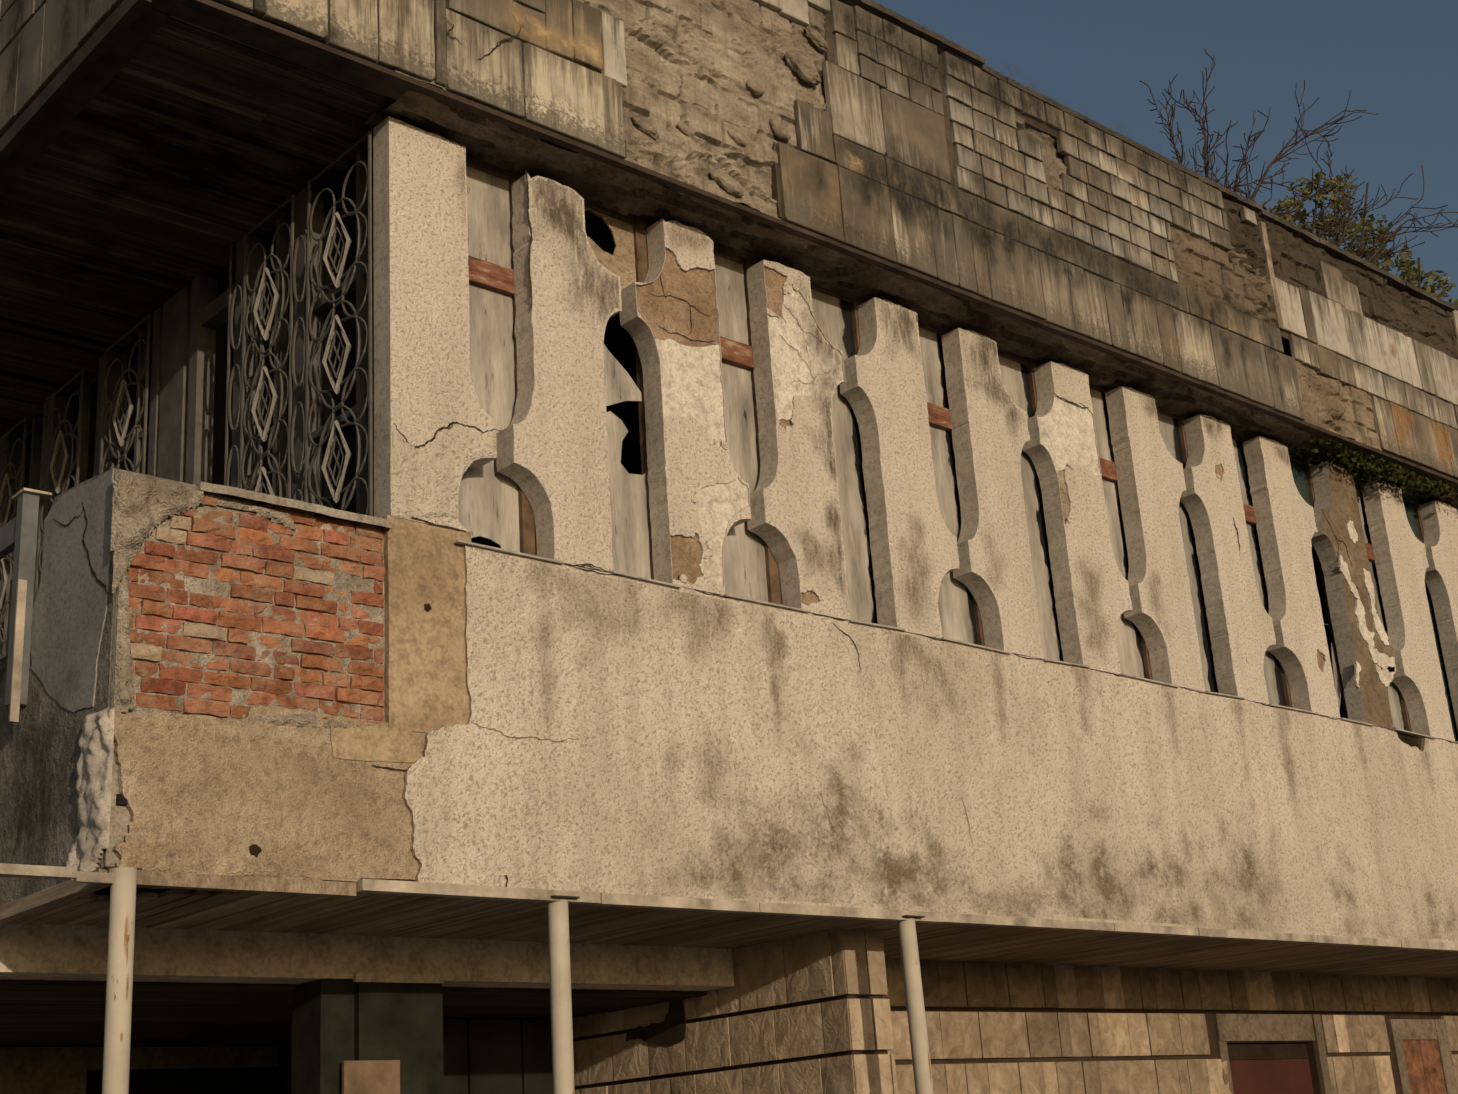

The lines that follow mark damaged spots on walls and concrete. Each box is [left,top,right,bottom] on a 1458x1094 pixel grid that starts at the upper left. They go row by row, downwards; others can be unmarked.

spalling [636,249,728,450]
crack [394,421,501,448]
peeling [670,478,749,587]
flaking render [1338,520,1396,689]
flaking render [64,468,471,882]
spalling [1317,650,1329,671]
leakage [759,826,793,877]
leakage [830,777,849,852]
leakage [878,842,947,903]
leakage [1062,845,1131,918]